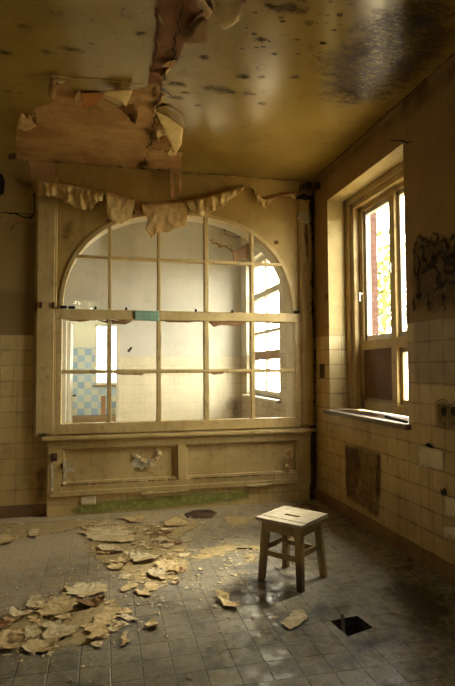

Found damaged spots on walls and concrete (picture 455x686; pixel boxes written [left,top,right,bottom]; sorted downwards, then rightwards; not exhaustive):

peeling [15,76,186,199]
crack [131,0,184,170]
damp [313,0,454,104]
peeling [130,447,162,472]